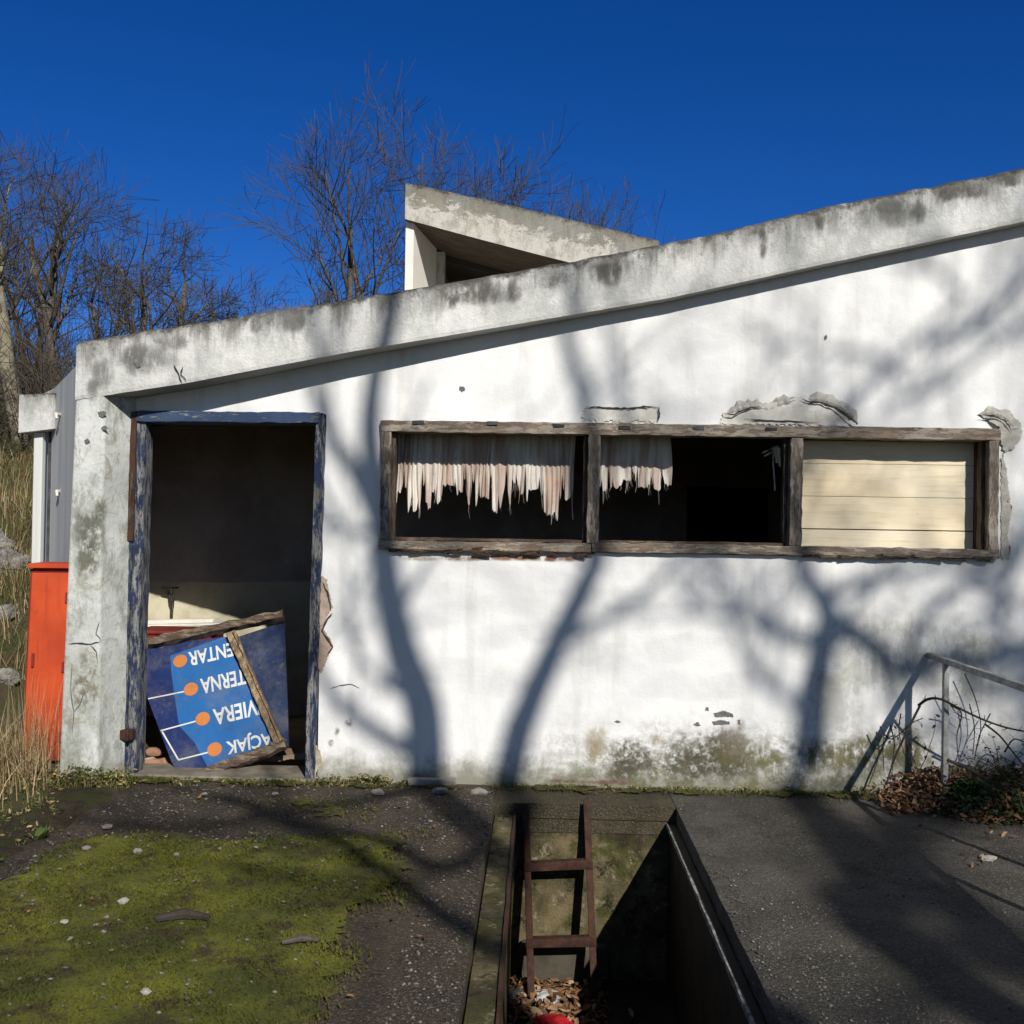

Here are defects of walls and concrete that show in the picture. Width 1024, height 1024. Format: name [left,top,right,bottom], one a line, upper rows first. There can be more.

leakage [78,501,105,572]
crack [70,623,101,663]
spalling [318,576,333,672]
peeling [693,707,740,726]
leakage [672,727,781,777]
leakage [809,750,853,767]